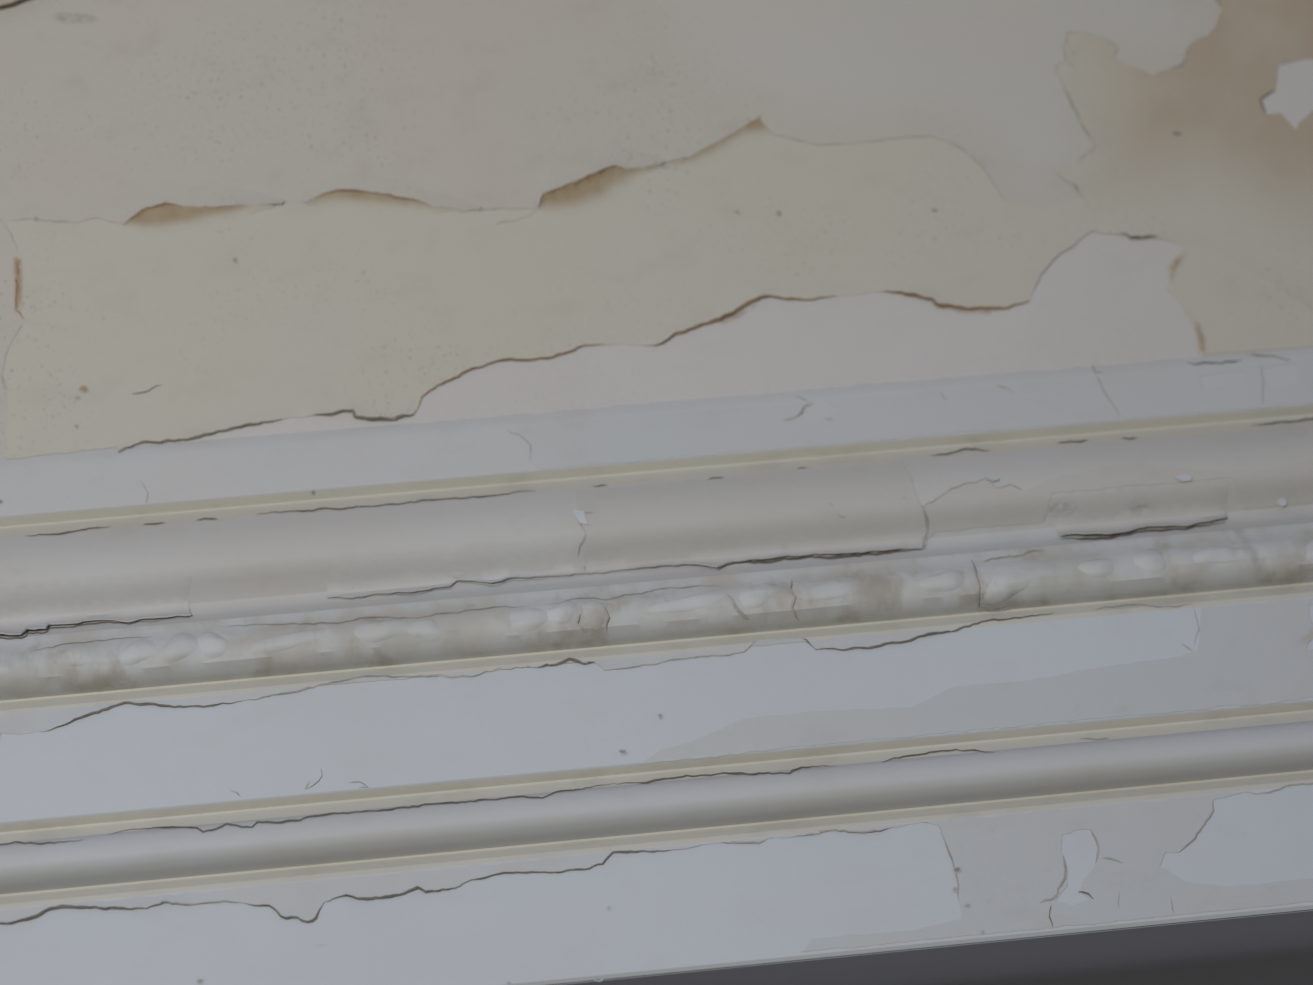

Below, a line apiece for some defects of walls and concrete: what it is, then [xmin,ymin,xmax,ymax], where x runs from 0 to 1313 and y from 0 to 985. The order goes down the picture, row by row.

peeling [2,0,1313,460]
crack [25,526,109,536]
crack [260,490,530,514]
crack [904,448,1021,547]
peeling [0,567,192,639]
crack [218,585,748,632]
crack [971,550,1044,611]
peeling [0,613,1052,736]
peeling [640,598,1313,764]
crack [883,749,987,762]
crack [0,765,835,845]
peeling [0,783,1313,952]